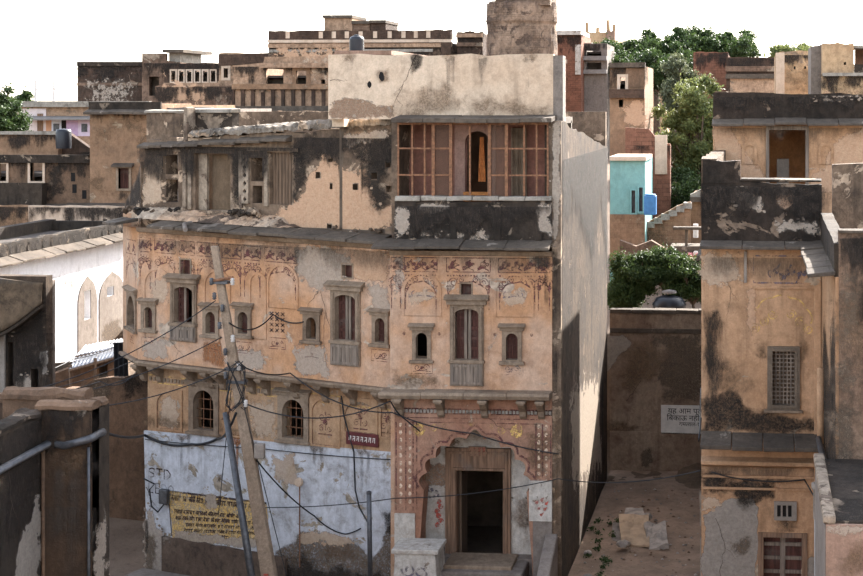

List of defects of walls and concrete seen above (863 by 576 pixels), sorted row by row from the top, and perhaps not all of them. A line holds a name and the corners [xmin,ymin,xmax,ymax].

damp [364,47,441,71]
flaking render [85,73,134,101]
damp [76,54,292,104]
flaking render [810,127,863,193]
damp [0,135,391,255]
flaking render [276,154,410,237]
flaking render [776,195,791,209]
flaking render [774,217,817,234]
damp [625,235,863,461]
flaking render [271,453,297,485]
flaking render [827,525,863,536]